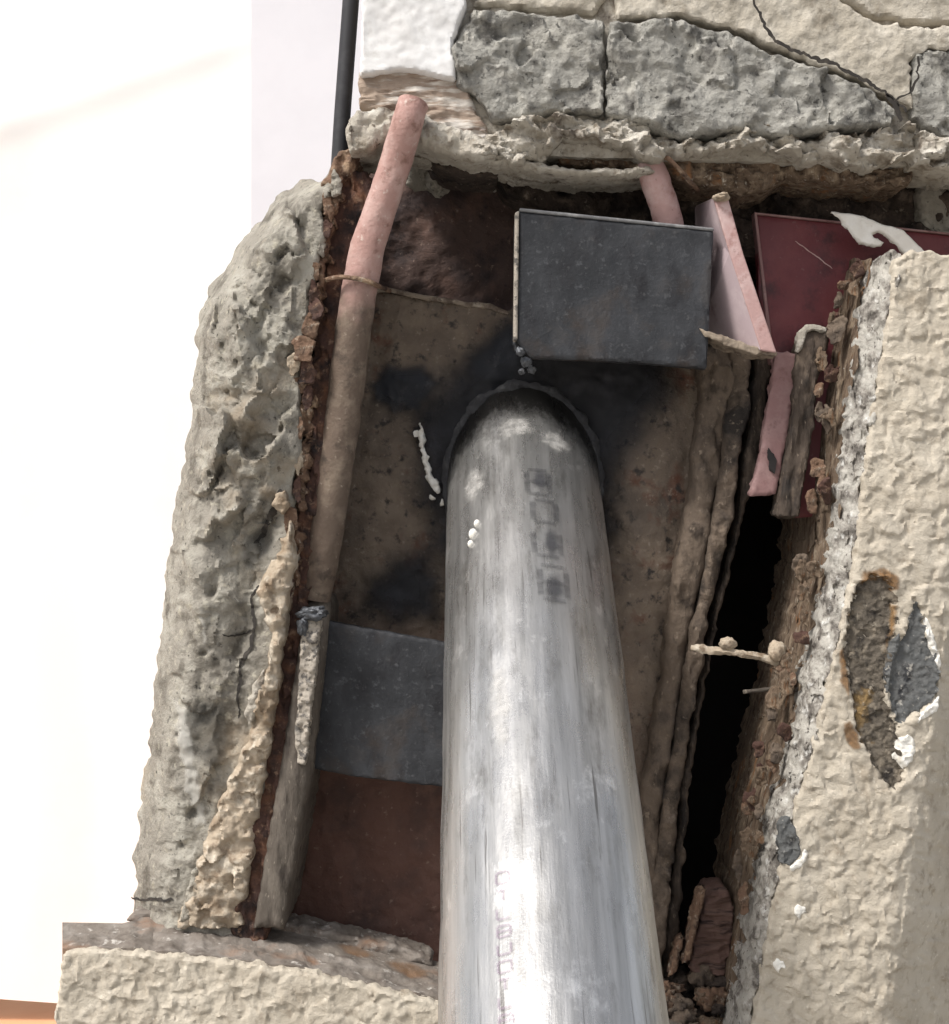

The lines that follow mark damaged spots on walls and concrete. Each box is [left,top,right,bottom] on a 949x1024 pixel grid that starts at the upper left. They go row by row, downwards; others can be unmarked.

crack [753,0,920,121]
peeling [813,258,865,435]
crack [254,489,282,543]
corrosion [284,385,319,612]
peeling [805,458,832,514]
crack [222,585,259,719]
spalling [678,494,824,938]
flaking render [843,575,941,790]
peeling [127,905,151,921]
peeling [272,913,434,966]